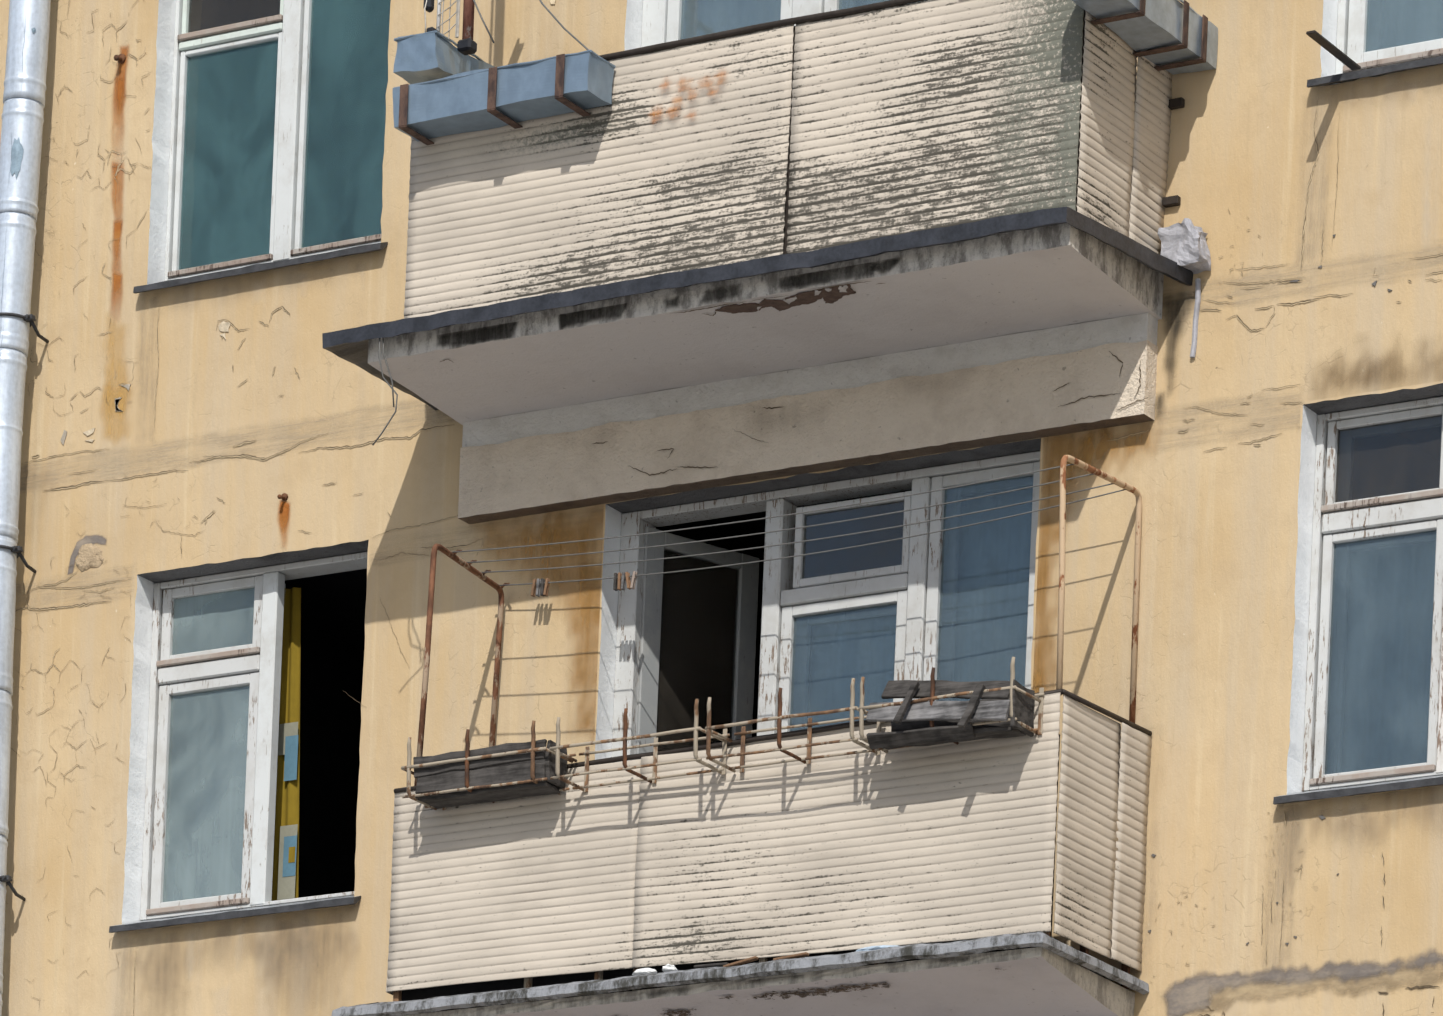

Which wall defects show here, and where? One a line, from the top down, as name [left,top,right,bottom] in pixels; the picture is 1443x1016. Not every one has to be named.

rust [114,47,128,112]
crack [1201,97,1443,331]
rust [113,164,122,300]
water stain [779,258,899,287]
water stain [702,286,738,301]
peeling [715,284,856,314]
water stain [559,303,626,328]
rust [279,501,289,532]
water stain [498,523,593,648]